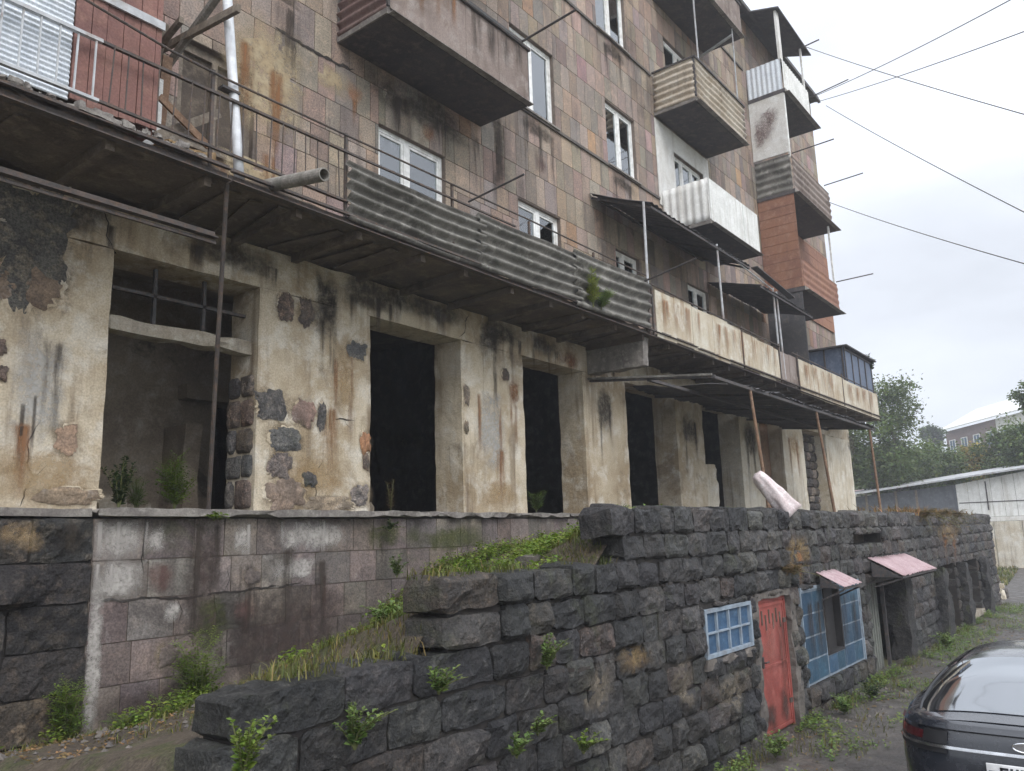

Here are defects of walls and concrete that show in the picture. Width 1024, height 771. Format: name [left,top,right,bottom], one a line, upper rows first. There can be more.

water stain [495,119,504,175]
peeling [0,176,80,322]
peeling [276,291,315,329]
peeling [53,422,78,456]
peeling [224,374,369,510]
peeling [360,430,371,471]
water stain [598,393,612,437]
crack [95,523,299,624]
water stain [220,521,341,668]